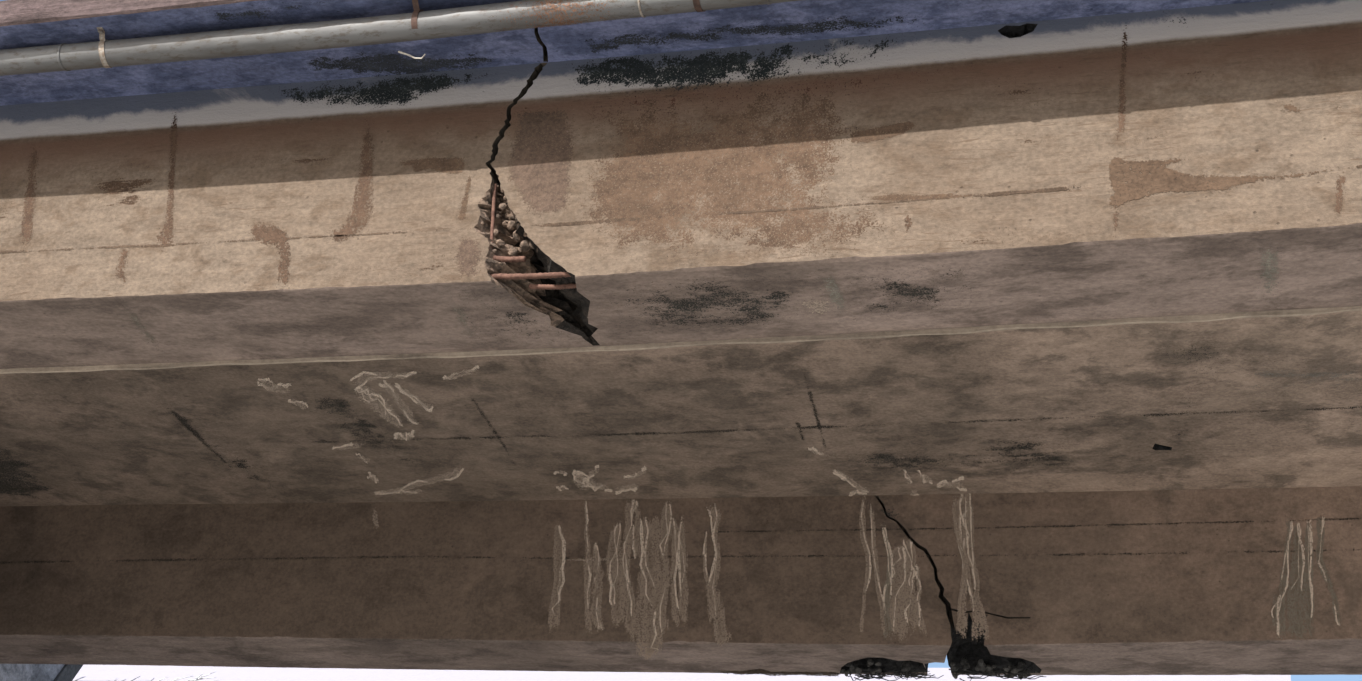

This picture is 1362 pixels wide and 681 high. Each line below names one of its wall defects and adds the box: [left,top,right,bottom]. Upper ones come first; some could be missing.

crack [486,28,548,186]
water stain [569,15,918,97]
peeling [449,80,894,346]
water stain [257,377,308,409]
water stain [350,371,433,441]
water stain [332,443,464,529]
water stain [548,465,732,661]
crack [116,495,1361,639]
water stain [808,447,927,641]
spalling [840,613,1046,681]
water stain [903,469,991,640]
water stain [1271,515,1343,640]